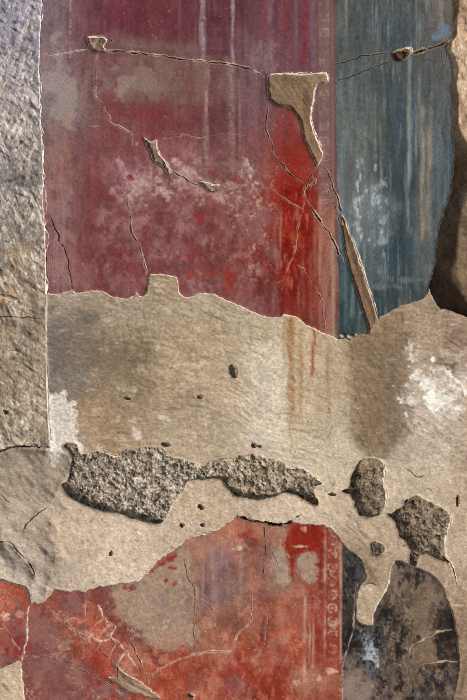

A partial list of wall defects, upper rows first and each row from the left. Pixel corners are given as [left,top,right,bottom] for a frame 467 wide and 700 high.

crack [42,32,268,146]
crack [48,214,76,291]
crack [124,197,151,276]
crack [256,105,346,330]
spalling [342,217,378,330]
spalling [46,374,322,523]
rust [281,315,333,437]
water stain [339,309,467,463]
crack [0,503,304,700]
peeling [102,542,202,667]
peeling [269,524,326,588]
spalling [342,458,458,584]